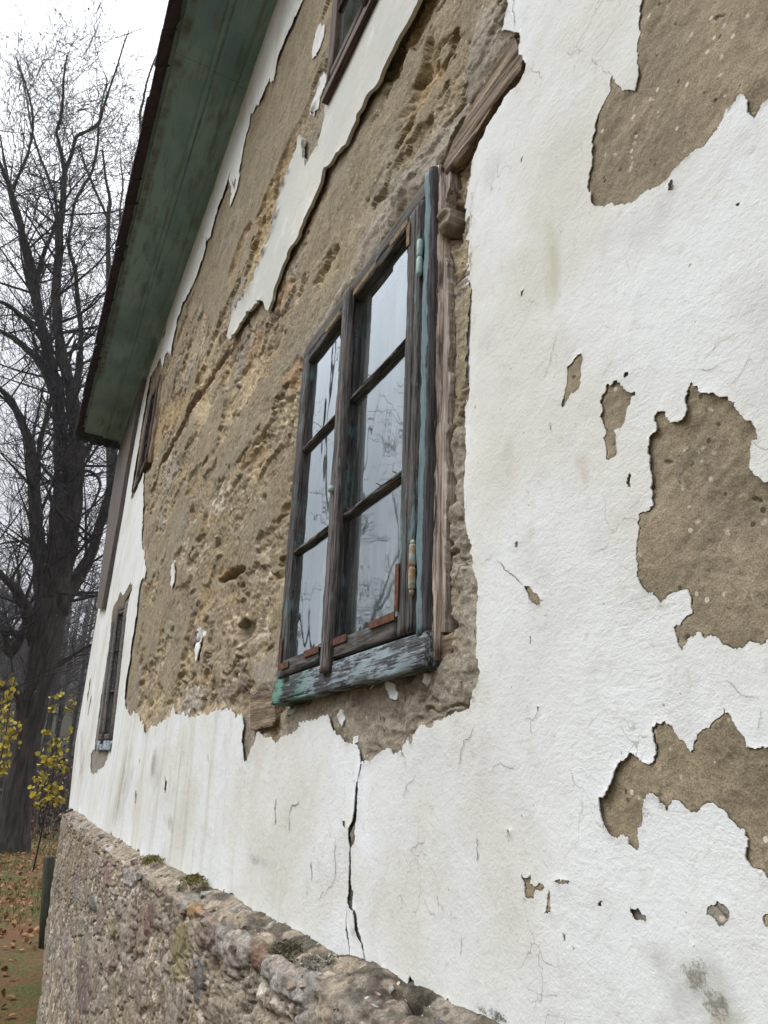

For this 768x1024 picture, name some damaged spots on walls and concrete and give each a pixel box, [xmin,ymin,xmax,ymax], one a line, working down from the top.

peeling [588,0,768,207]
peeling [116,0,520,762]
peeling [562,354,583,407]
peeling [601,372,635,460]
peeling [636,383,768,650]
peeling [87,622,112,775]
crack [306,759,365,956]
peeling [522,875,570,914]
spalling [631,908,646,922]
peeling [599,713,768,878]
spalling [707,902,730,926]